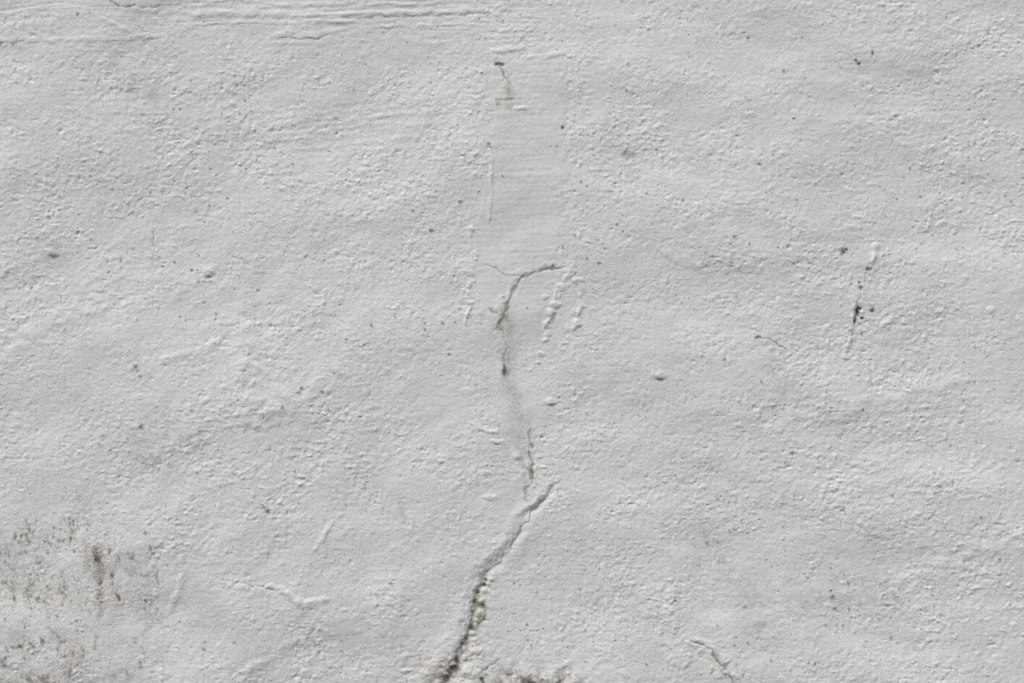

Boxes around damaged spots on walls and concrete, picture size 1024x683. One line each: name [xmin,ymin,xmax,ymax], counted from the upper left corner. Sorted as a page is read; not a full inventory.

crack [441,576,495,681]